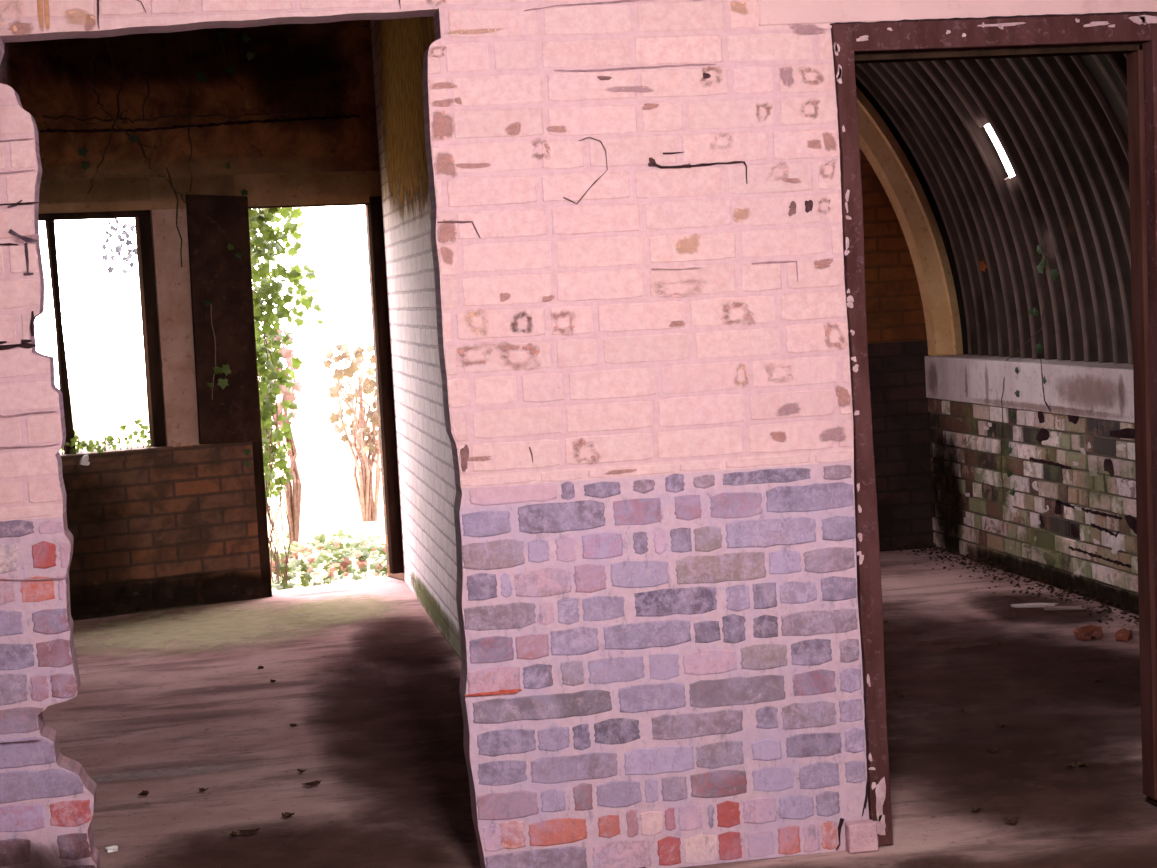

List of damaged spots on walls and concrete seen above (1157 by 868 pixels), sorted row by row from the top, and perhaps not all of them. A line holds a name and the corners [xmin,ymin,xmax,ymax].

crack [830,11,1157,25]
crack [0,119,289,142]
crack [563,137,608,204]
crack [651,152,747,184]
crack [0,170,39,275]
crack [0,311,37,350]
peeling [458,312,540,367]
water stain [984,373,1124,416]